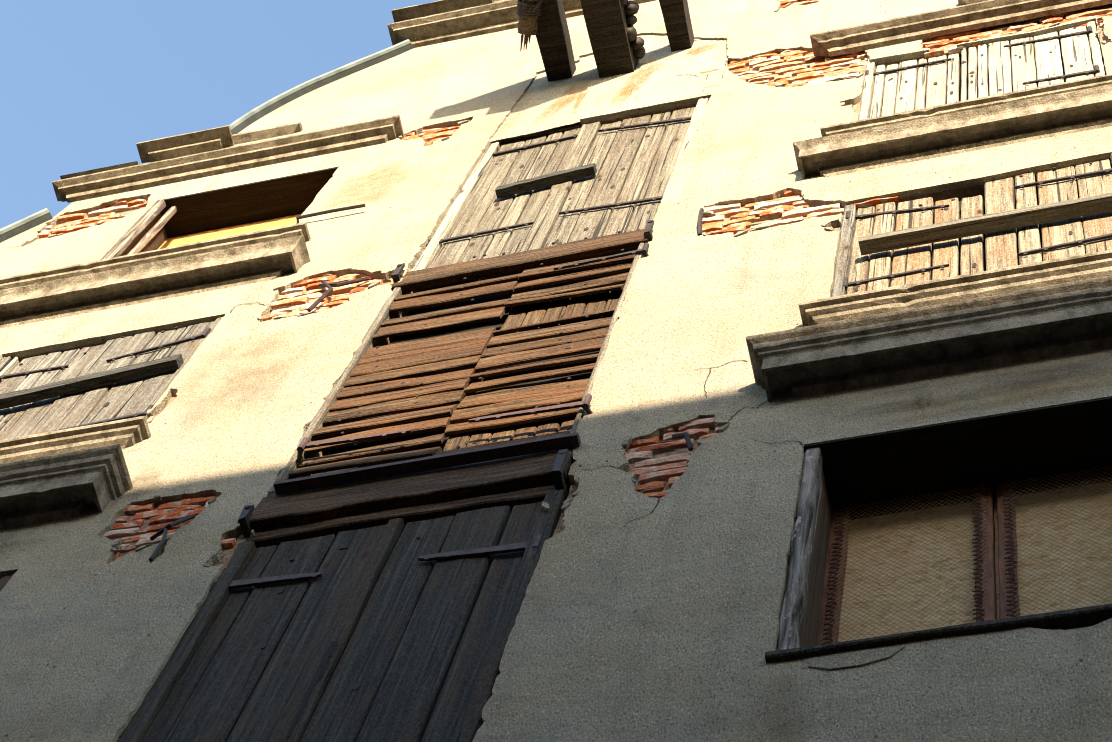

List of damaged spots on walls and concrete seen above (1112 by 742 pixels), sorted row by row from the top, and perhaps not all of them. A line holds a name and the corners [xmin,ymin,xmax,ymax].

flaking render [774,0,820,12]
flaking render [922,6,1112,60]
flaking render [490,35,868,142]
flaking render [399,120,470,146]
flaking render [21,198,148,246]
flaking render [702,190,899,237]
flaking render [257,268,403,322]
crack [700,360,745,398]
flaking render [617,417,730,499]
flaking render [102,495,218,563]
flaking render [221,538,237,549]